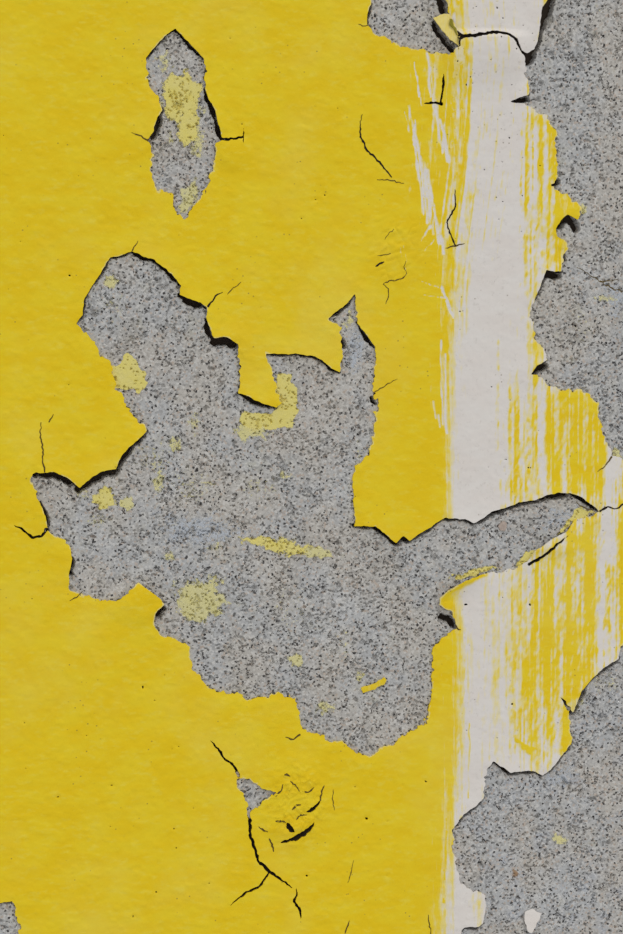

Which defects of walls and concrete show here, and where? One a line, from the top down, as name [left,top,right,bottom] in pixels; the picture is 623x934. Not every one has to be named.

peeling [136,18,233,219]
peeling [356,0,461,62]
peeling [500,0,623,460]
peeling [23,242,610,756]
peeling [0,891,22,934]
crack [211,741,240,776]
crack [234,808,301,918]
peeling [442,635,623,934]